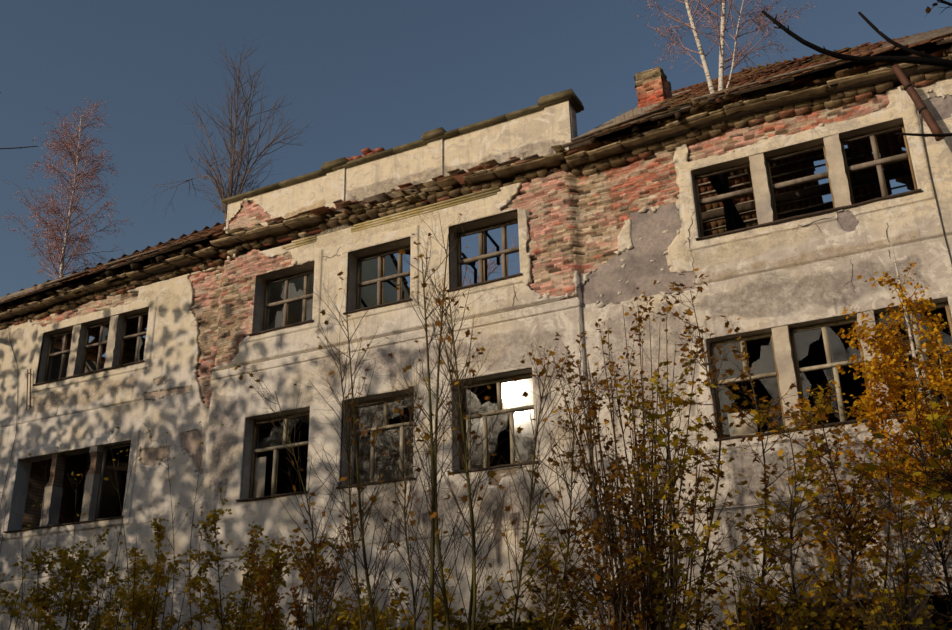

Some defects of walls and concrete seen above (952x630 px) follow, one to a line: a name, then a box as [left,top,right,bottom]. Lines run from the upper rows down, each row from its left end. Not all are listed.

flaking render [916,89,952,122]
flaking render [501,90,890,308]
flaking render [143,249,297,409]
flaking render [138,429,204,476]